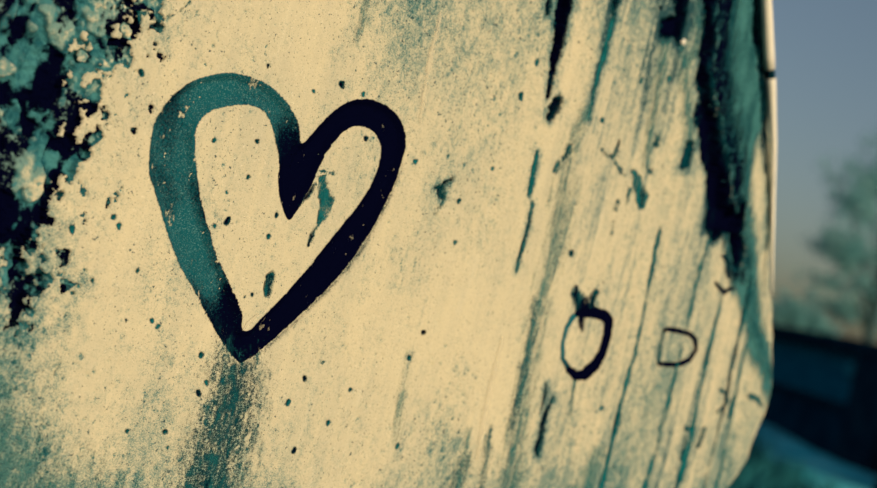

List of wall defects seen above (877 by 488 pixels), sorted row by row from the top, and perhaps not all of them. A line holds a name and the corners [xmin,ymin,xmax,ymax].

spalling [0,0,166,337]
damp [642,0,772,403]